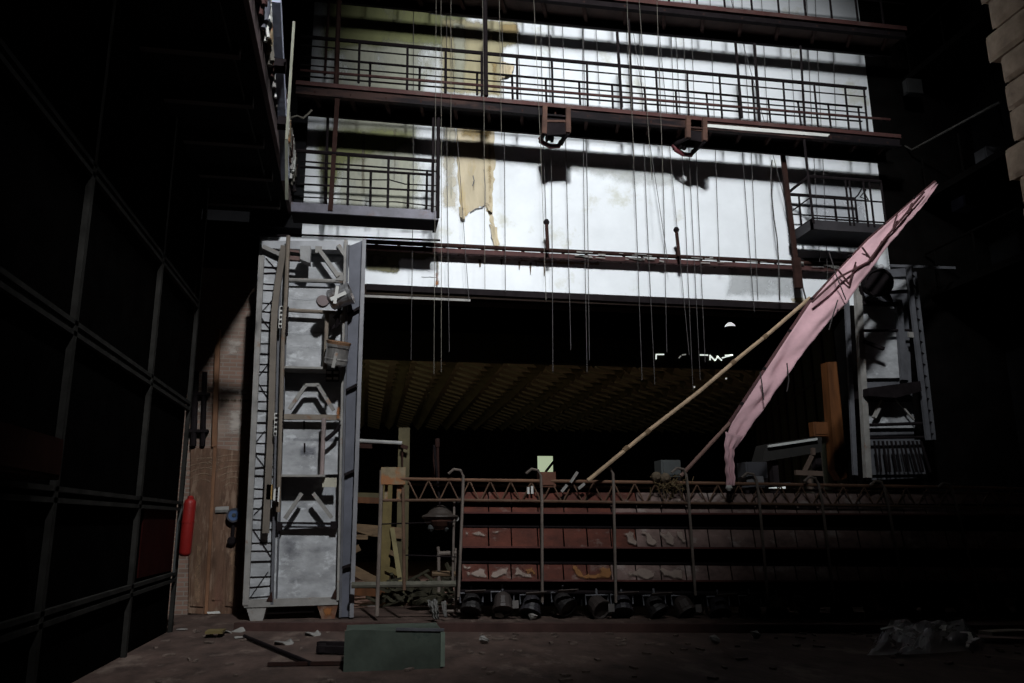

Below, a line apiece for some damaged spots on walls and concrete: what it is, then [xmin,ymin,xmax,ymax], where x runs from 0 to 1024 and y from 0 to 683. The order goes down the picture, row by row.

peeling [455,129,500,246]
peeling [625,531,685,545]
peeling [464,566,532,577]
peeling [628,568,683,579]